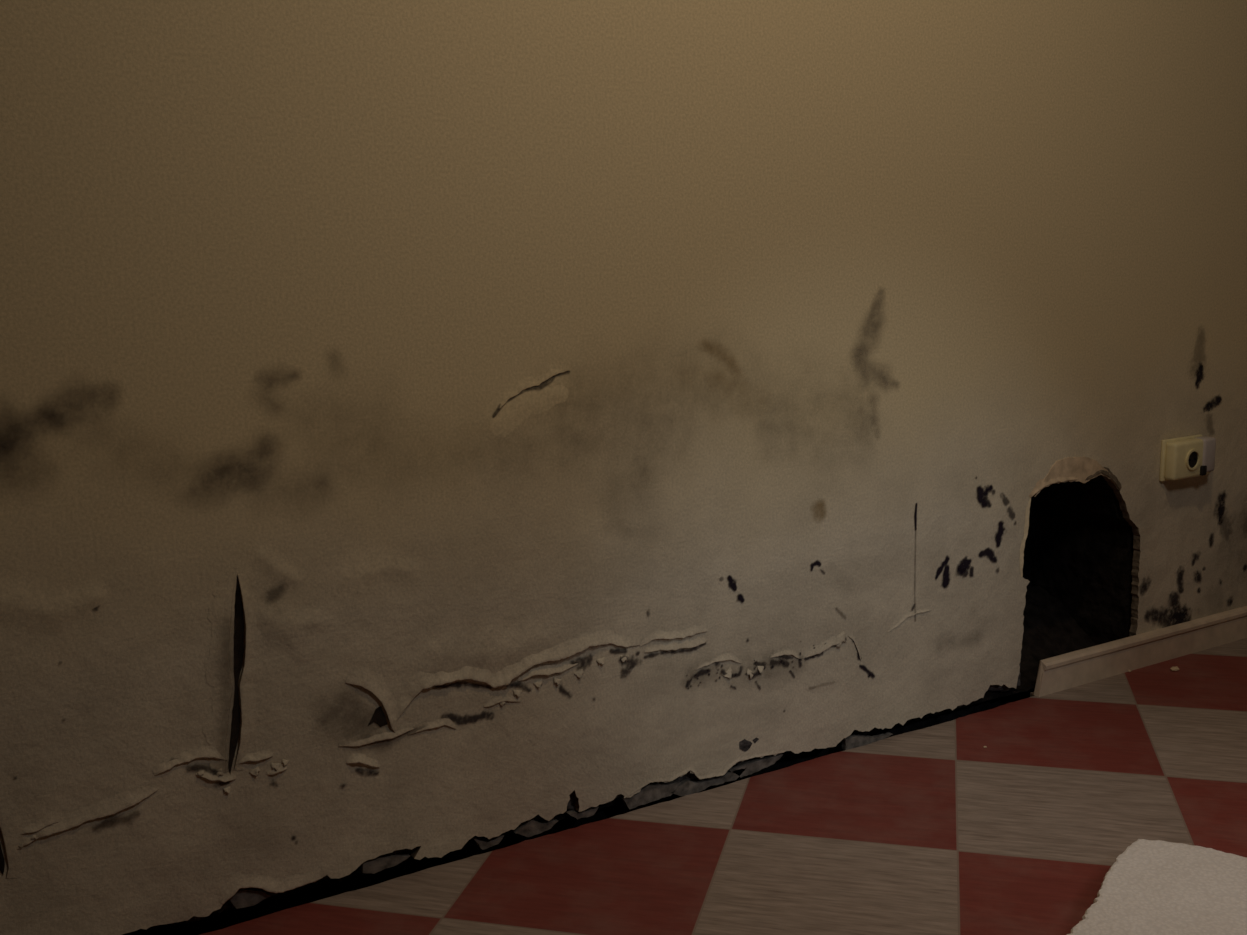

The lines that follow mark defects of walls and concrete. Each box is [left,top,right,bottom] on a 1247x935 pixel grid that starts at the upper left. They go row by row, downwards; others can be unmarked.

crack [491,363,570,418]
damp [1195,363,1203,388]
damp [1204,396,1222,411]
damp [1210,492,1226,546]
damp [1145,554,1205,627]
crack [202,572,263,774]
flaking render [151,457,1122,935]